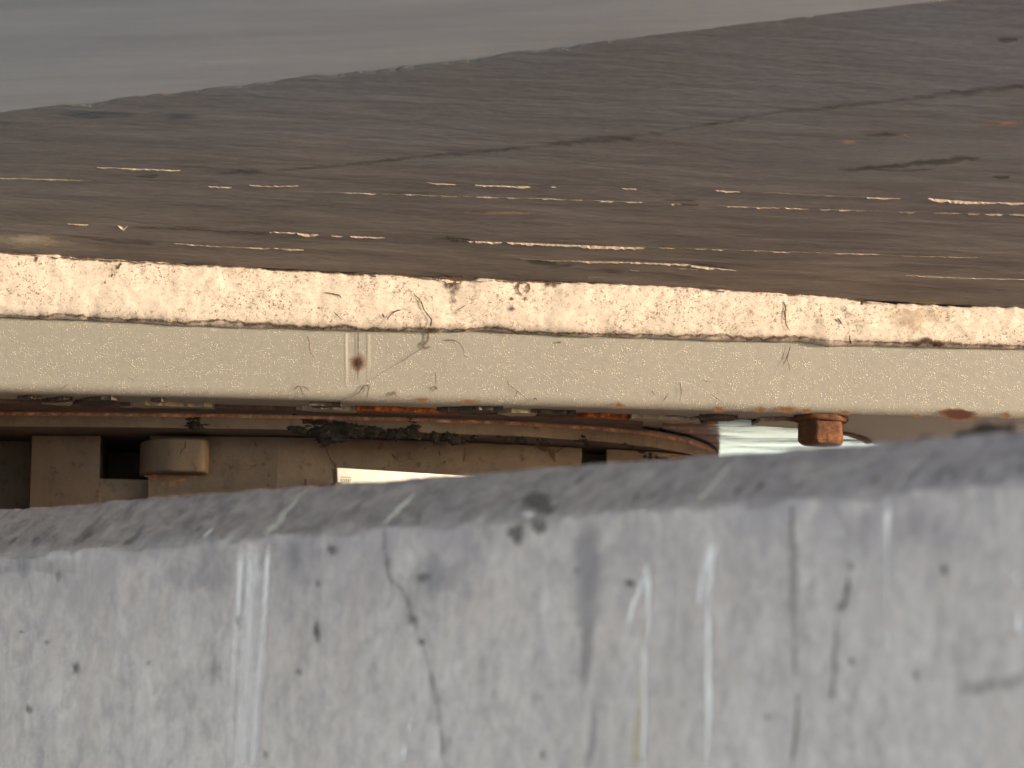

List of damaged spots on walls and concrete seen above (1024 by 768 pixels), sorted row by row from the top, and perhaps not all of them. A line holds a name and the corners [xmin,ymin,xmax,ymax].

corrosion [941,409,977,421]
leakage [236,552,270,653]
leakage [628,567,651,760]